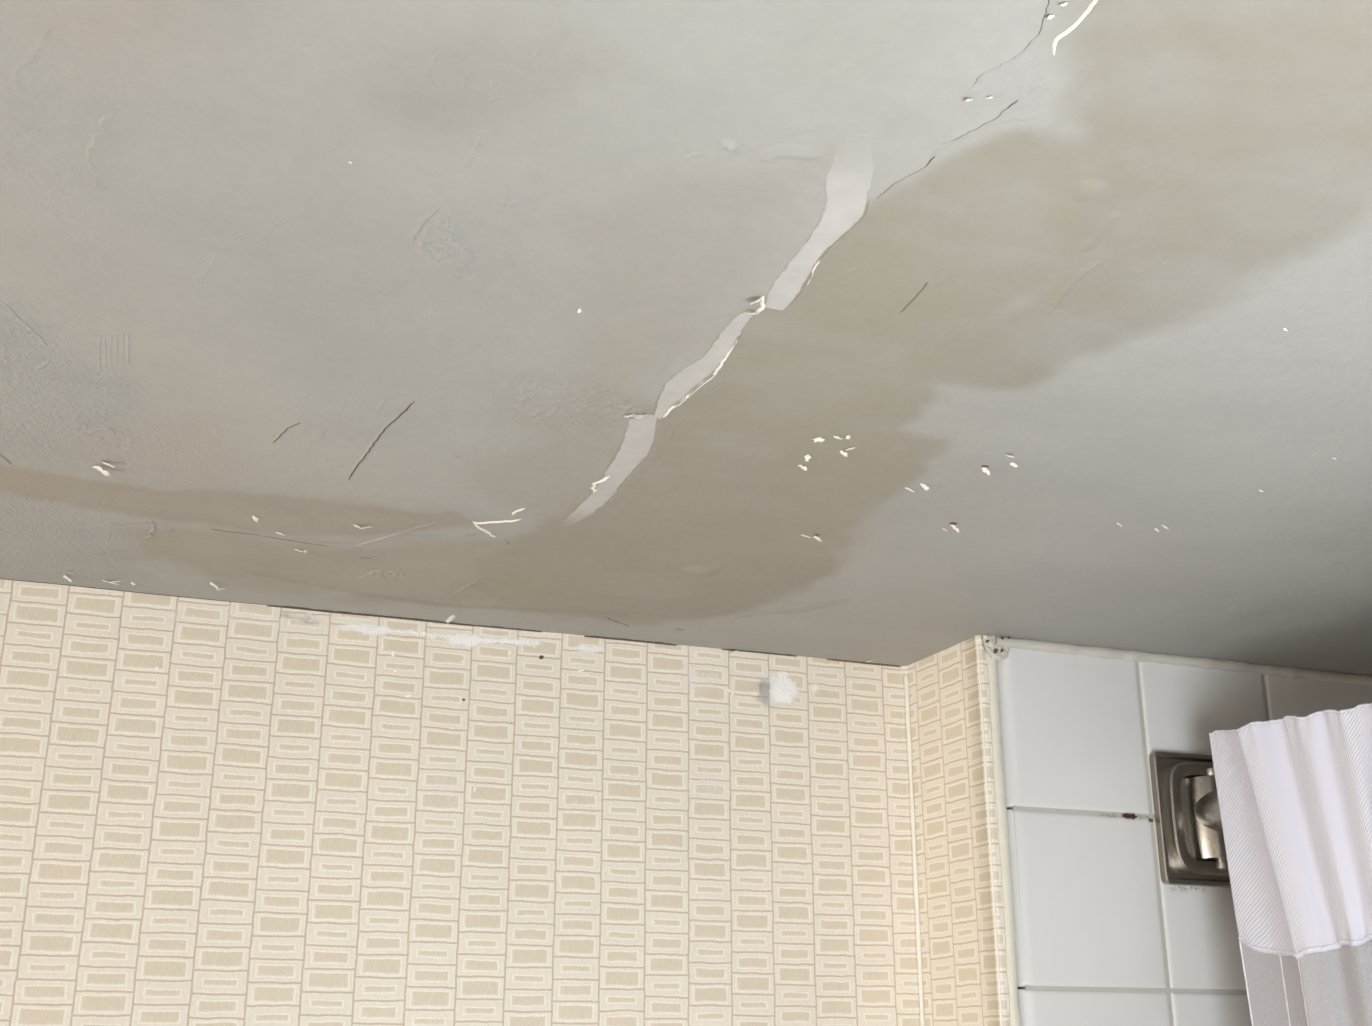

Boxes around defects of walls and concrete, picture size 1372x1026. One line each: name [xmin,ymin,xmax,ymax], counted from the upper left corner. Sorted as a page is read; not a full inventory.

crack [347,401,415,481]
damp [0,0,1372,629]
peeling [554,132,891,529]